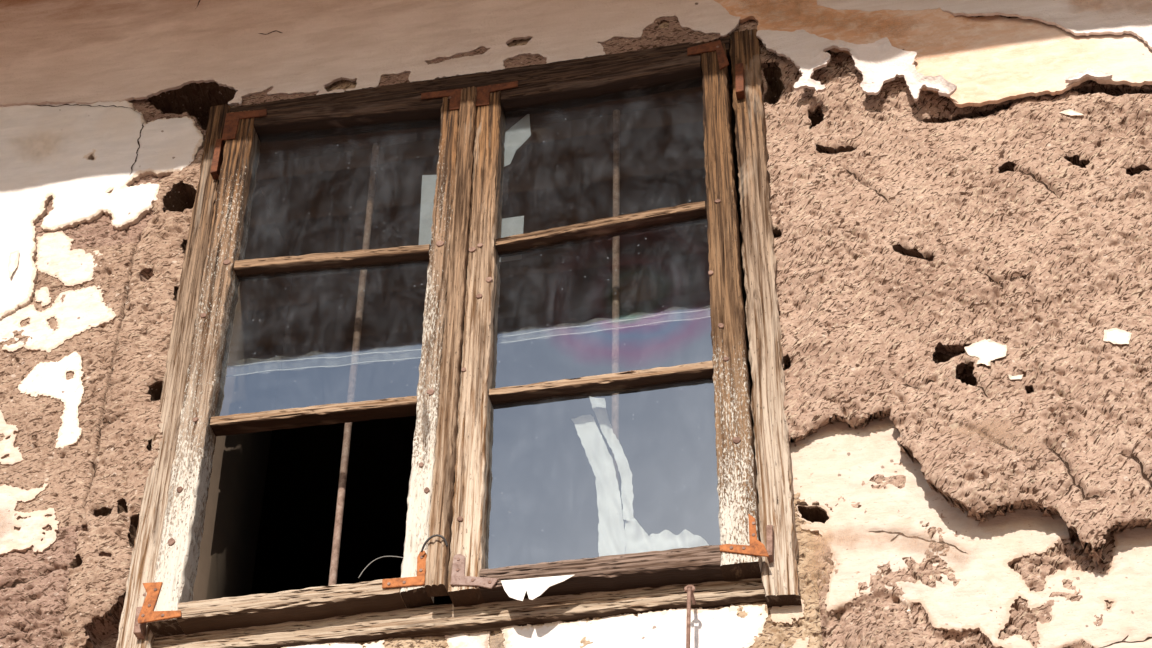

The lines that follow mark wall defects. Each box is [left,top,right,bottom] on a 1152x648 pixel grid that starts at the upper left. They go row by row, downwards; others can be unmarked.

peeling [0,99,206,648]
spalling [231,79,357,107]
spalling [281,0,1152,648]